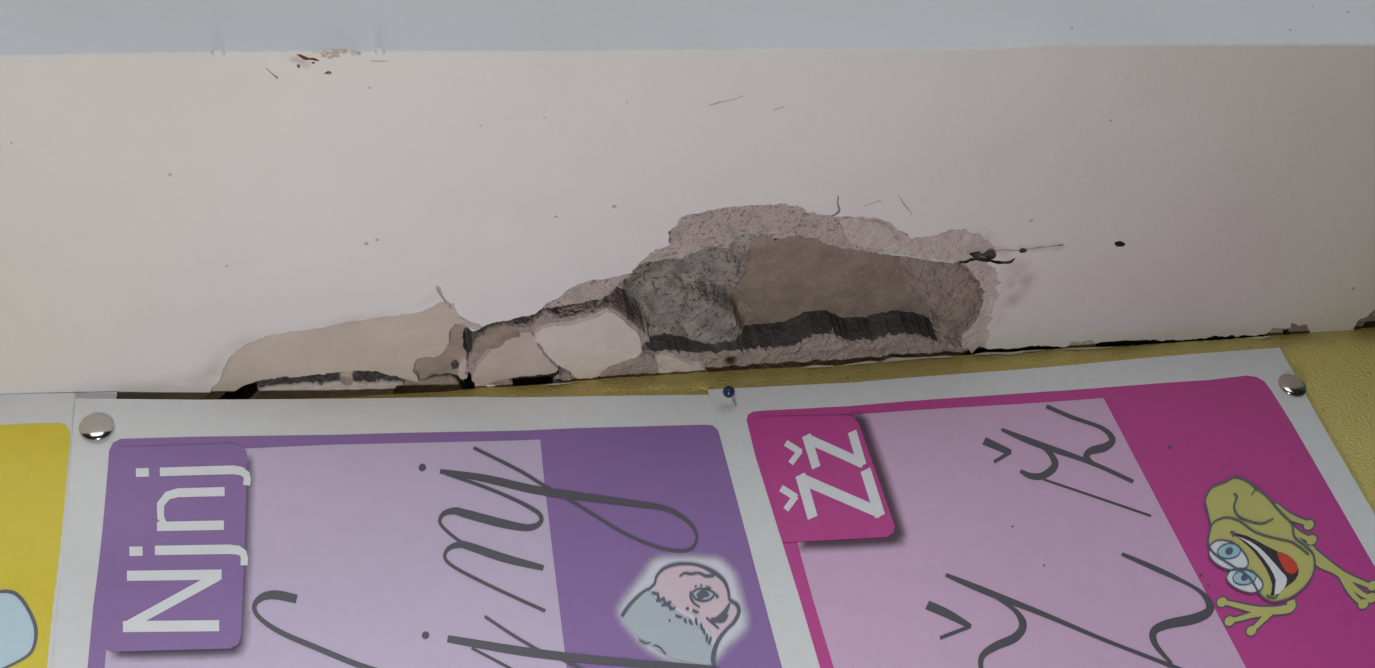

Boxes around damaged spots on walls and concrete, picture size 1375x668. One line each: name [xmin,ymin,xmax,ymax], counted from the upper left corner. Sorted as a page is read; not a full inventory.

flaking render [202,301,487,400]
flaking render [598,200,1043,390]
flaking render [1252,323,1310,339]
flaking render [1354,310,1375,329]